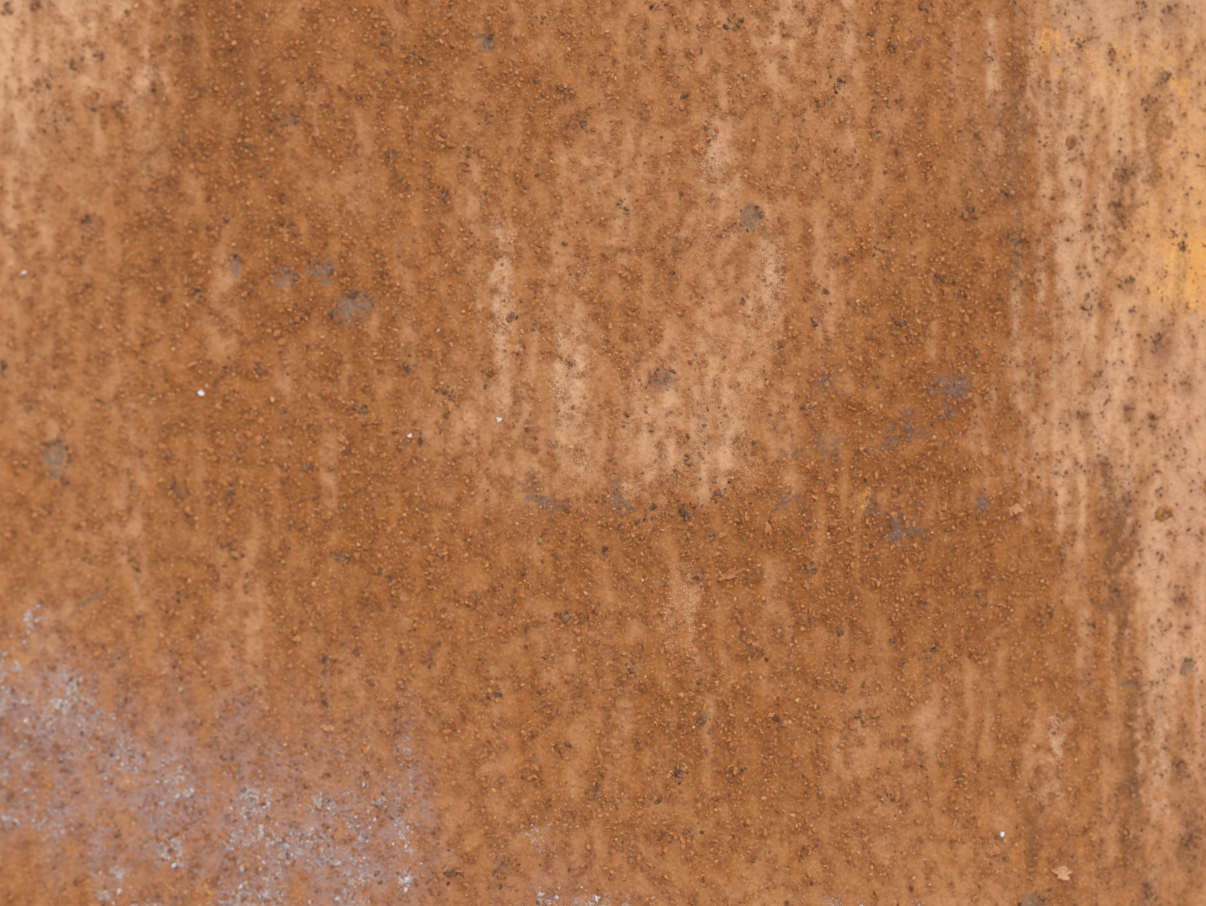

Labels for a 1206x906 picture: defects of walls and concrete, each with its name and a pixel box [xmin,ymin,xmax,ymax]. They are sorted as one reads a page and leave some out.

corrosion [723,14,745,31]
corrosion [1066,135,1078,149]
corrosion [934,4,1048,385]
corrosion [1107,72,1178,291]
corrosion [636,481,731,531]
corrosion [1155,504,1173,522]
corrosion [1018,430,1158,906]
water stain [0,604,424,906]
corrosion [649,765,689,804]
water stain [522,874,629,906]